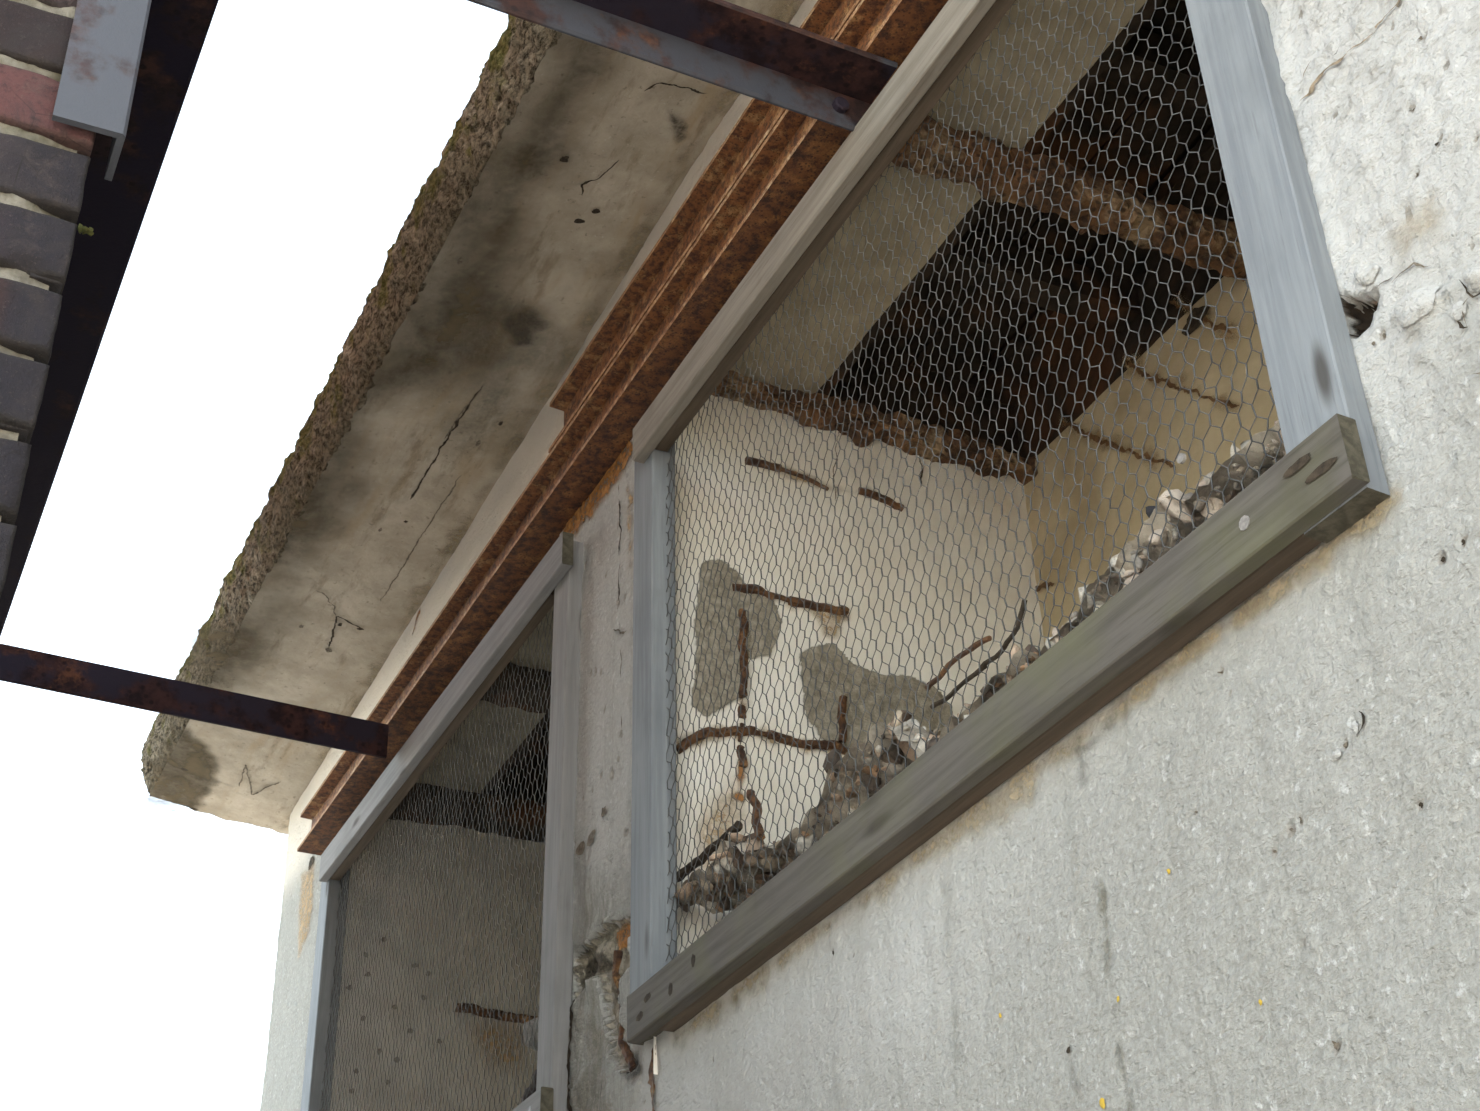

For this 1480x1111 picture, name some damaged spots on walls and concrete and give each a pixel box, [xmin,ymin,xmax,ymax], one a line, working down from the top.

crack [1301,0,1401,99]
leakage [371,36,600,390]
hole [1340,295,1386,346]
corrosion [562,441,633,534]
corrosion [745,456,829,491]
corrosion [712,370,1038,485]
corrosion [858,487,904,512]
leakage [186,625,262,683]
flaking render [691,559,782,716]
flaking render [800,643,953,748]
leakage [145,731,216,812]
spalling [566,917,641,1111]